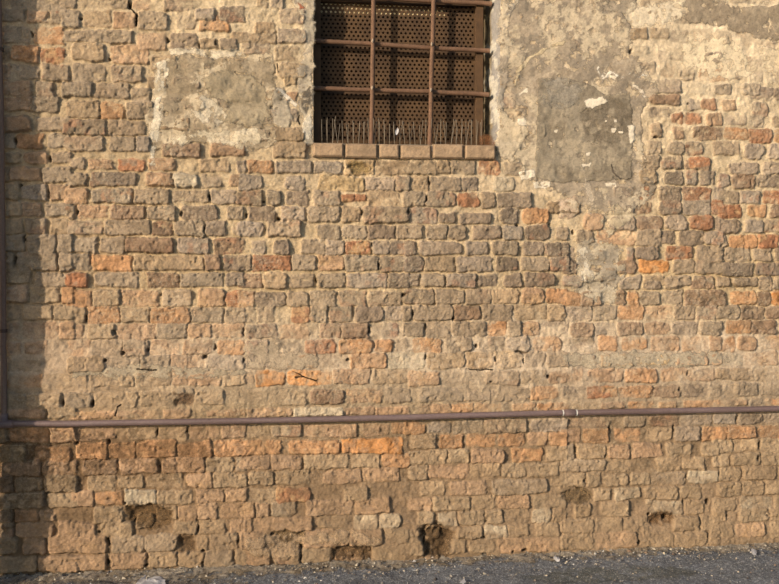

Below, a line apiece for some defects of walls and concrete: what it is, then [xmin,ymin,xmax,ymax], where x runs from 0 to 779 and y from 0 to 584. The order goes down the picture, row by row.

spalling [126,503,172,530]
spalling [420,524,453,557]